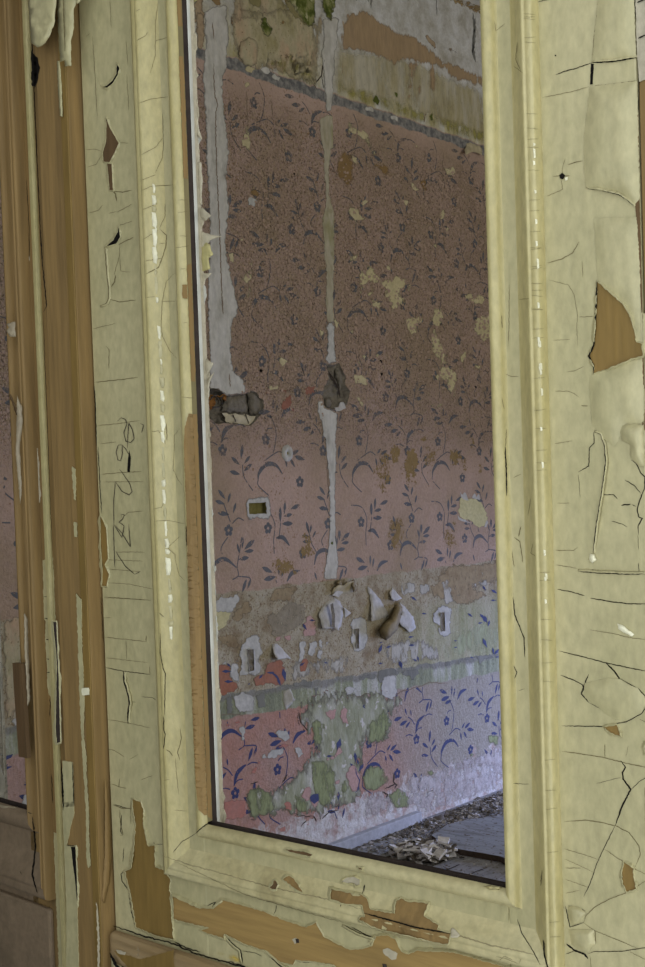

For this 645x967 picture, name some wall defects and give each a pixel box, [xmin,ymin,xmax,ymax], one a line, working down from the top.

peeling [28,0,81,117]
leakage [232,0,322,84]
leakage [340,0,484,140]
crack [527,15,640,148]
crack [90,84,188,511]
crack [501,160,636,343]
peeling [587,199,645,389]
peeling [179,56,294,823]
crack [502,400,645,604]
peeling [54,594,91,967]
crack [498,599,645,967]
peeling [110,798,511,967]